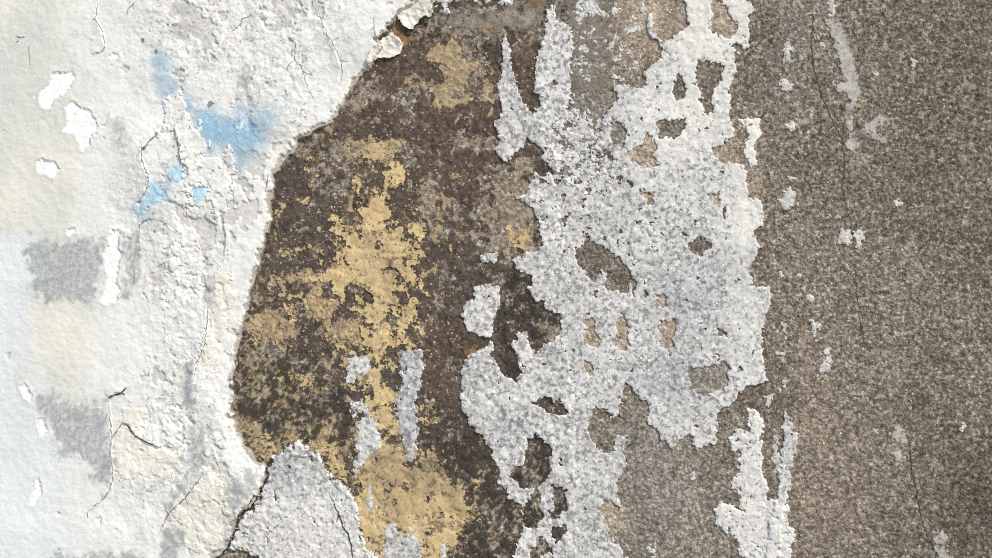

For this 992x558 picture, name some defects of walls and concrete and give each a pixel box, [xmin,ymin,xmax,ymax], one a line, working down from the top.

crack [312,0,348,80]
peeling [39,69,98,151]
peeling [37,158,60,177]
peeling [233,0,800,558]
crack [87,388,155,517]
crack [160,477,201,531]